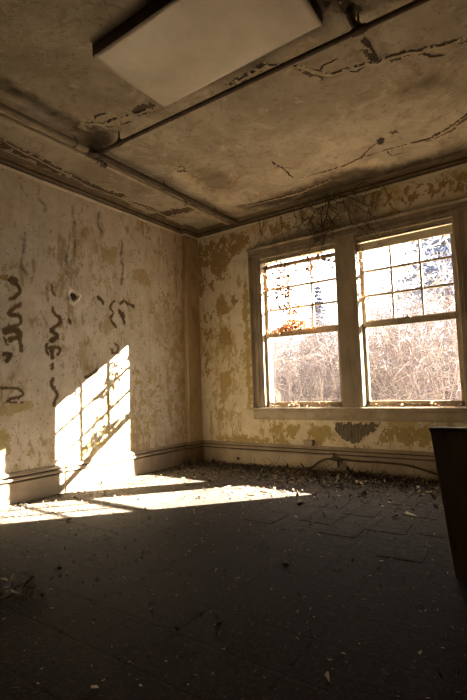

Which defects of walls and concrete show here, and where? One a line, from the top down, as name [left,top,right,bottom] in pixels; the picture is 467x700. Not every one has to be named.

crack [229,0,467,87]
flaking render [0,137,126,200]
flaking render [144,204,198,218]
crack [236,114,467,208]
peeling [372,171,467,208]
spalling [66,288,82,306]
peeling [198,231,256,423]
peeling [70,291,186,462]
peeling [0,428,13,460]
peeling [216,421,432,451]